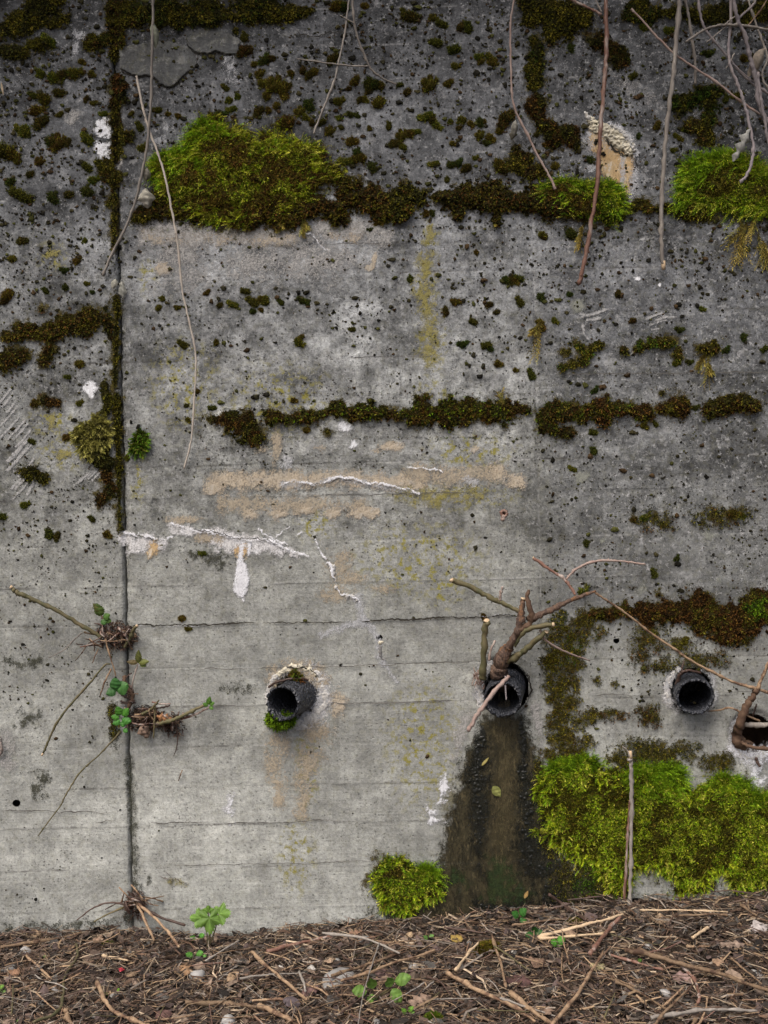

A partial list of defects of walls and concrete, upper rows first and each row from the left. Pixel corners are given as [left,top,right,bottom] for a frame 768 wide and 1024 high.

damp [203,431,527,522]
damp [363,701,614,922]